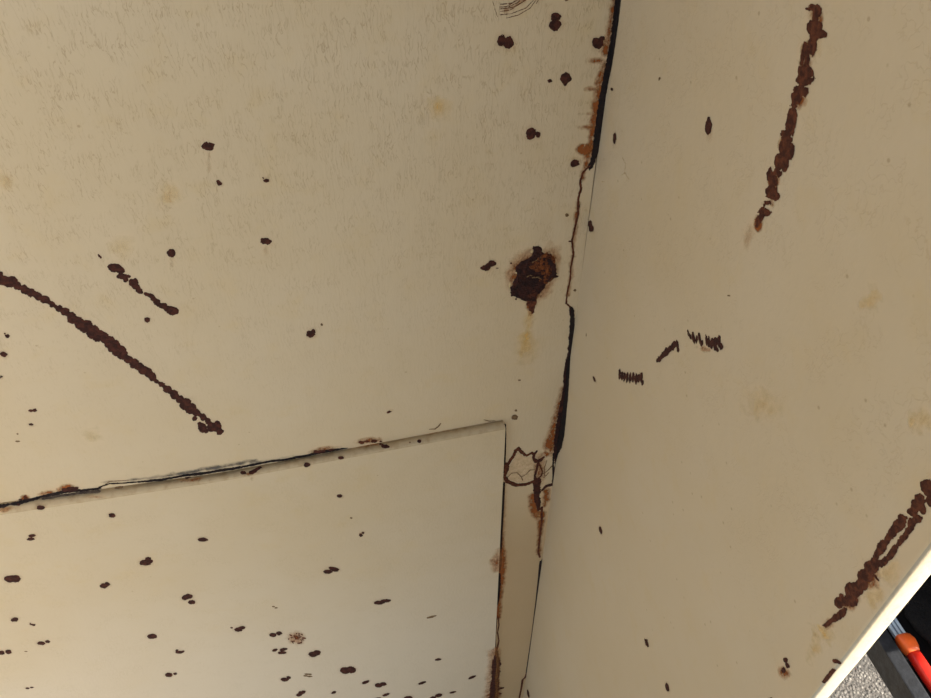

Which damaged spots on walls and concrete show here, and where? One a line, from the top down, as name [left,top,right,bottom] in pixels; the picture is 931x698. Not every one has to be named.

corrosion [592,36,605,49]
crack [544,0,621,482]
corrosion [480,246,559,314]
corrosion [656,340,679,362]
corrosion [687,330,723,352]
corrosion [618,369,644,386]
corrosion [503,447,554,534]
corrosion [4,575,21,583]
crack [519,506,545,698]
corrosion [269,631,306,654]